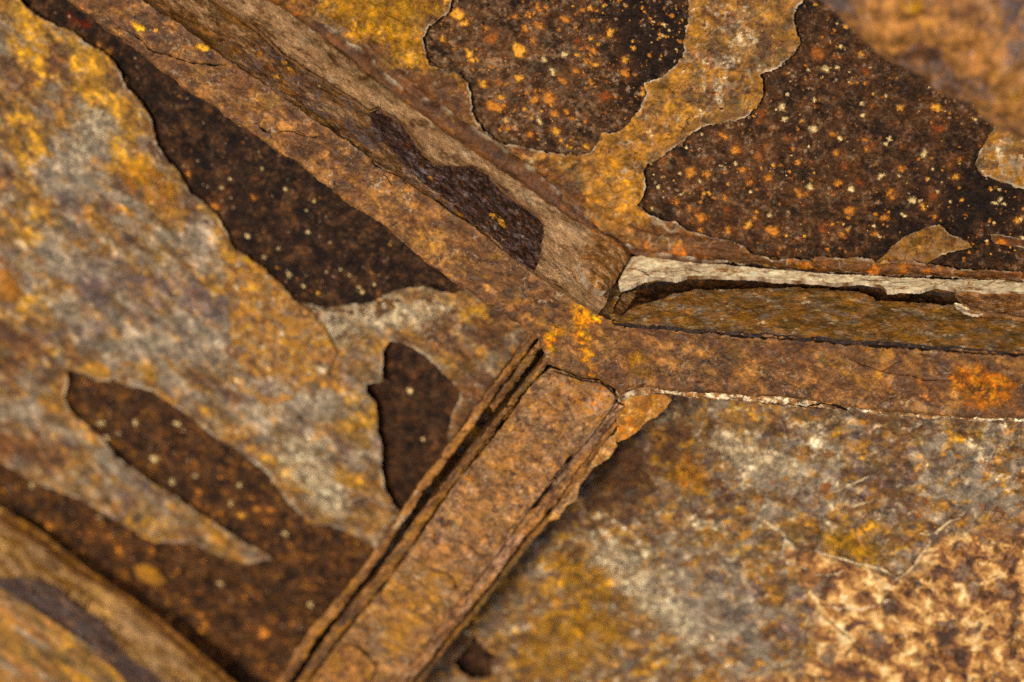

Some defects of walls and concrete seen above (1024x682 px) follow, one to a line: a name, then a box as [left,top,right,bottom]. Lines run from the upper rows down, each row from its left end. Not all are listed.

peeling [0,370,378,682]
peeling [13,0,479,405]
rust [0,0,601,571]
peeling [366,341,460,511]
peeling [370,110,544,271]
peeling [410,0,689,170]
rust [267,0,1024,281]
rust [424,395,1024,682]
peeling [618,0,1024,321]
crack [792,403,853,415]
crack [674,330,1024,382]
rust [950,366,1018,408]